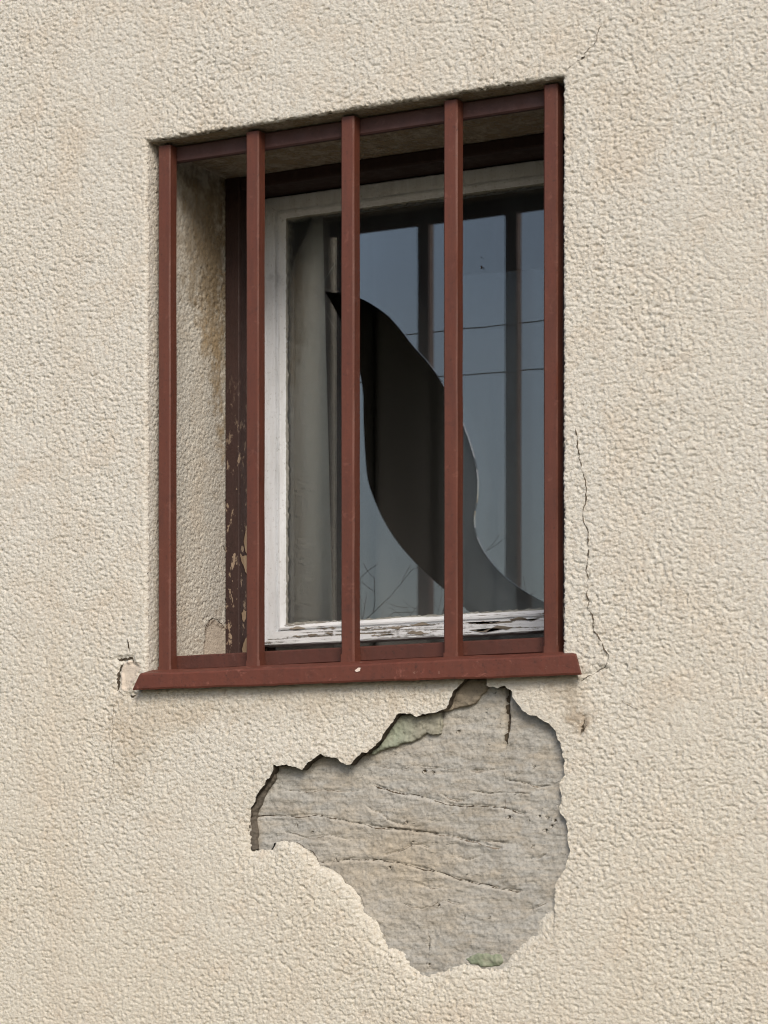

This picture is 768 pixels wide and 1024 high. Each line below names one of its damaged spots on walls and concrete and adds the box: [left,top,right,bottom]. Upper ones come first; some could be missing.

flaking render [121,661,141,691]
crack [575,429,609,681]
flaking render [249,678,570,977]